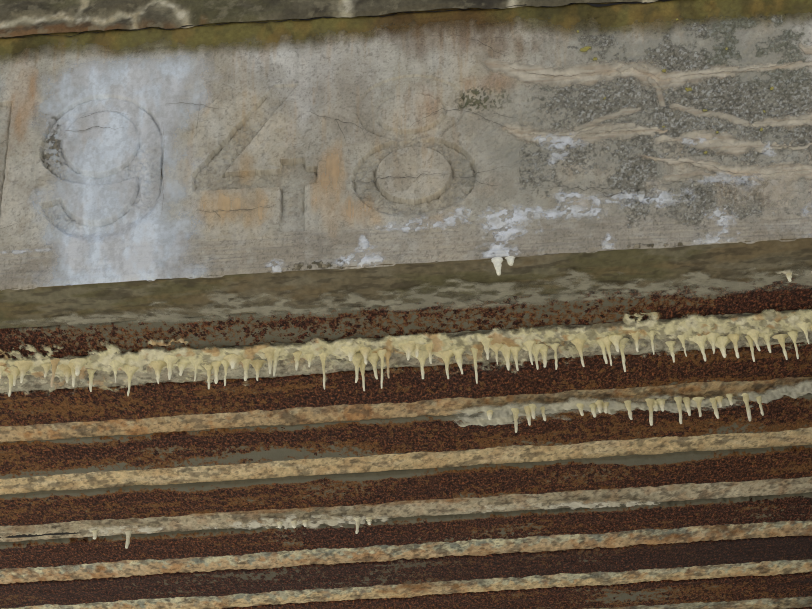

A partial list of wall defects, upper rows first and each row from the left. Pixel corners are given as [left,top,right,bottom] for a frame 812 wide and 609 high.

crack [411,107,812,197]
efflorescence [48,190,812,325]
efflorescence [0,310,812,397]
efflorescence [456,381,812,433]